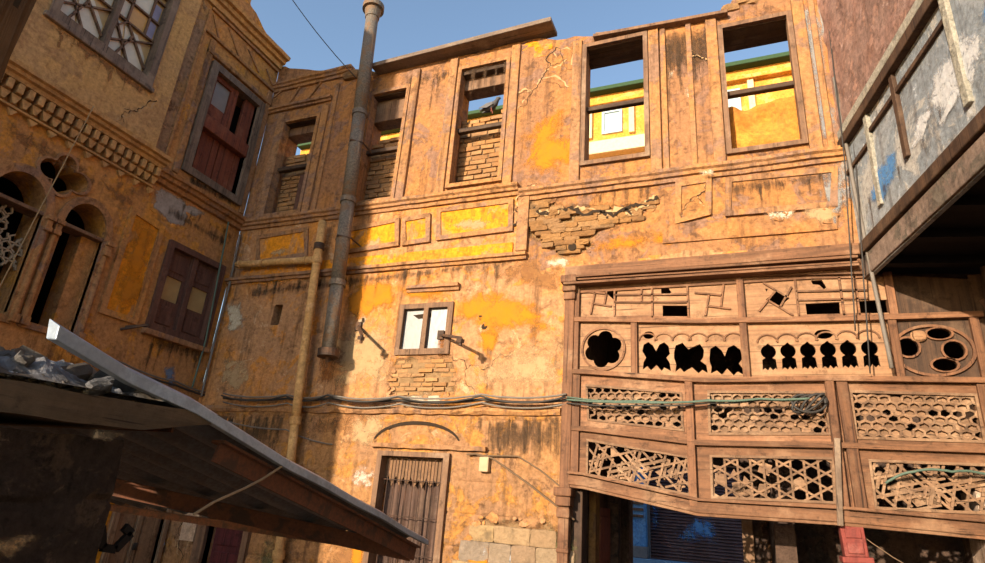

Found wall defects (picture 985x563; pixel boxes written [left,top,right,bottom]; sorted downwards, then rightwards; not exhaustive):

crack [516,47,573,115]
crack [114,100,157,124]
flaking render [150,184,204,228]
flaking render [528,192,663,259]
flaking render [385,357,460,398]